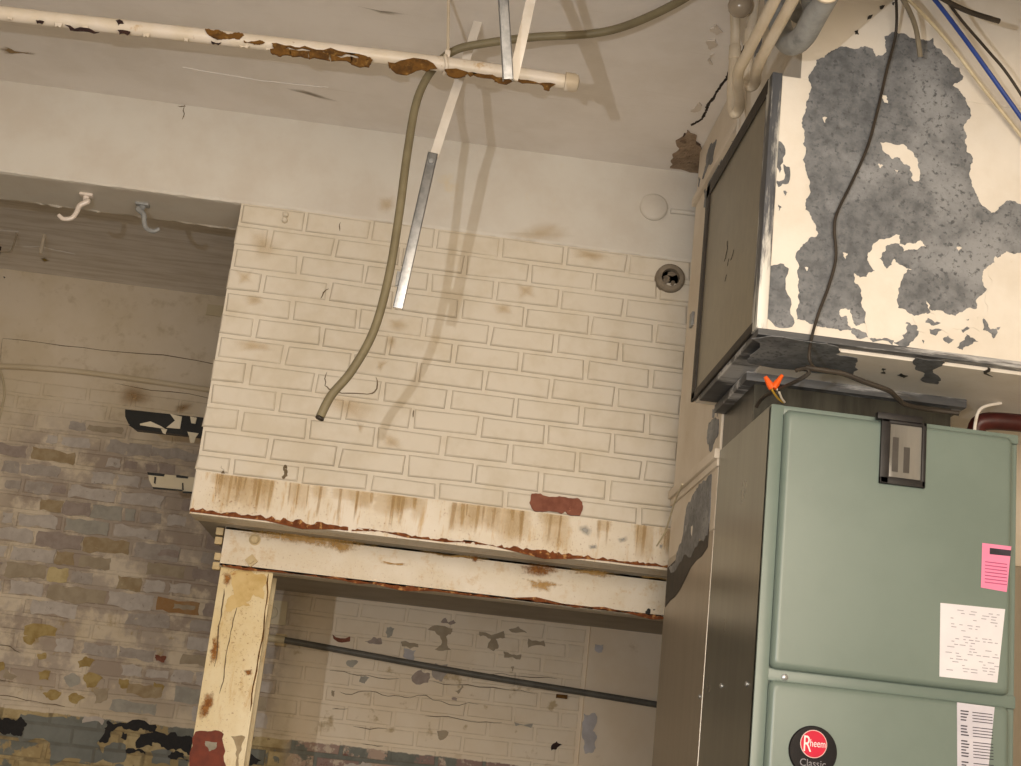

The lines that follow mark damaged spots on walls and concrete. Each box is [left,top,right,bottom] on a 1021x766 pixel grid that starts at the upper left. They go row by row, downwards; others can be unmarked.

rust [205,29,371,60]
rust [388,58,437,76]
rust [467,72,555,86]
spalling [670,130,722,207]
peeling [747,32,1021,374]
peeling [898,357,945,384]
peeling [669,474,712,573]
rust [190,508,668,620]
peeling [0,414,267,766]
peeling [428,618,456,651]
peeling [479,627,545,672]
rust [200,696,213,716]